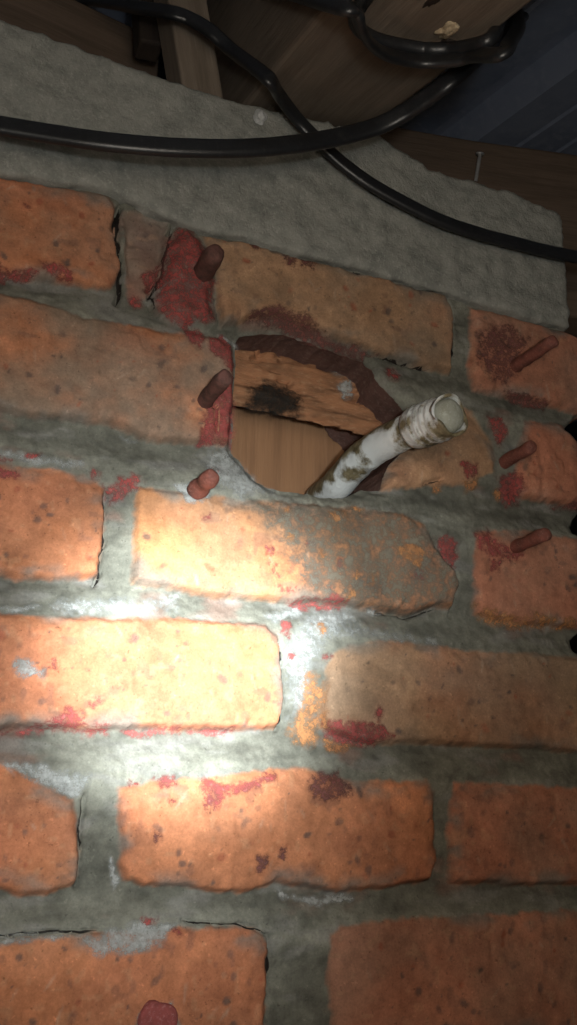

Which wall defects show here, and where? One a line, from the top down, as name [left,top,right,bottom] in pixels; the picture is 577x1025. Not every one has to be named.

spalling [130,227,404,451]
crack [93,494,104,588]
crack [75,798,83,846]
crack [0,929,97,937]
crack [186,921,269,973]